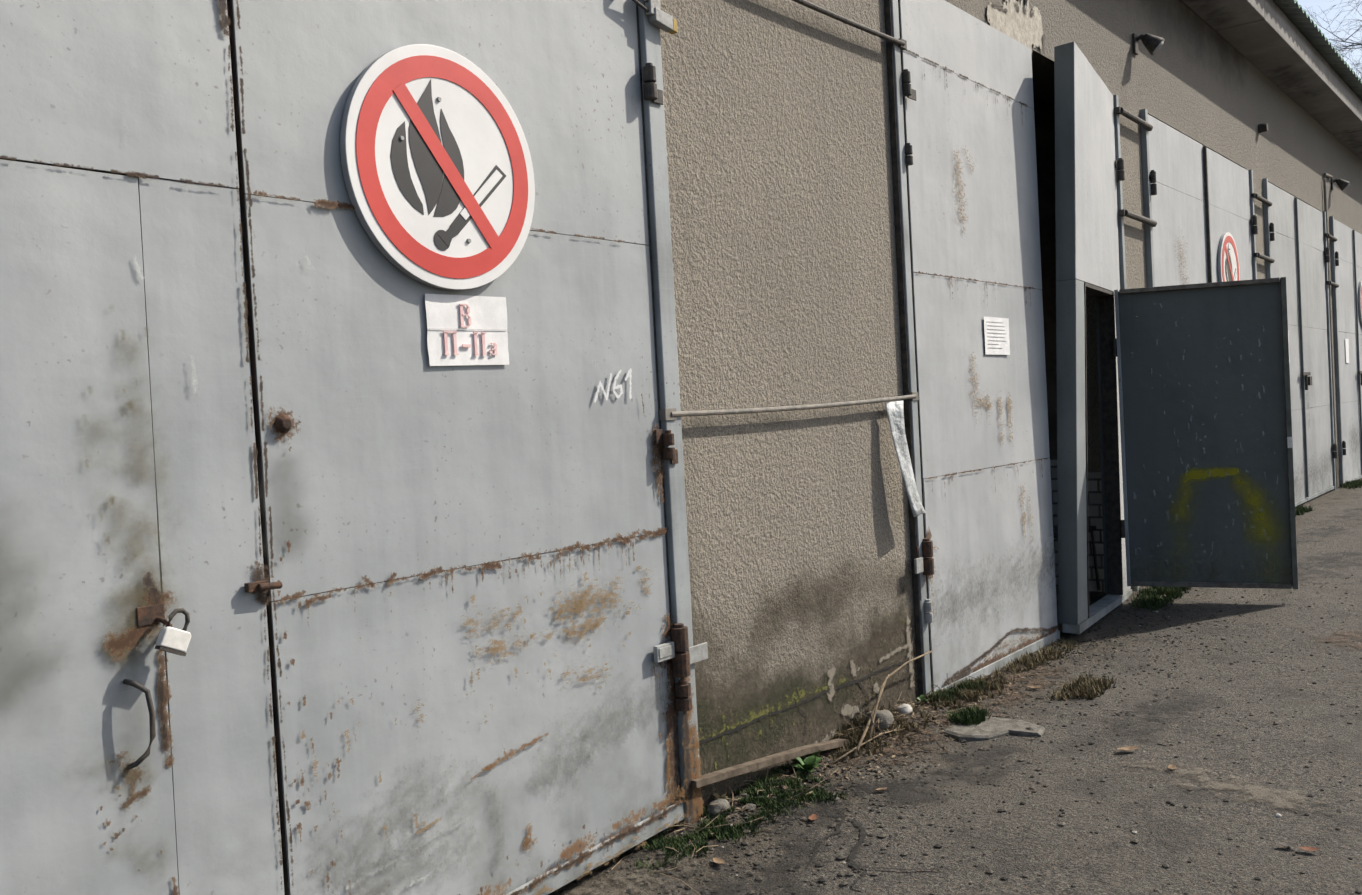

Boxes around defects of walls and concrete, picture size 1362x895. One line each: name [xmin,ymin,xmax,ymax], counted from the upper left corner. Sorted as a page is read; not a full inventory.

flaking render [987,0,1045,54]
corrosion [111,169,159,179]
corrosion [180,0,669,885]
corrosion [927,458,1048,498]
corrosion [969,352,1013,445]
corrosion [103,572,174,767]
corrosion [478,613,704,895]
damp [696,617,932,811]
damp [650,823,678,840]